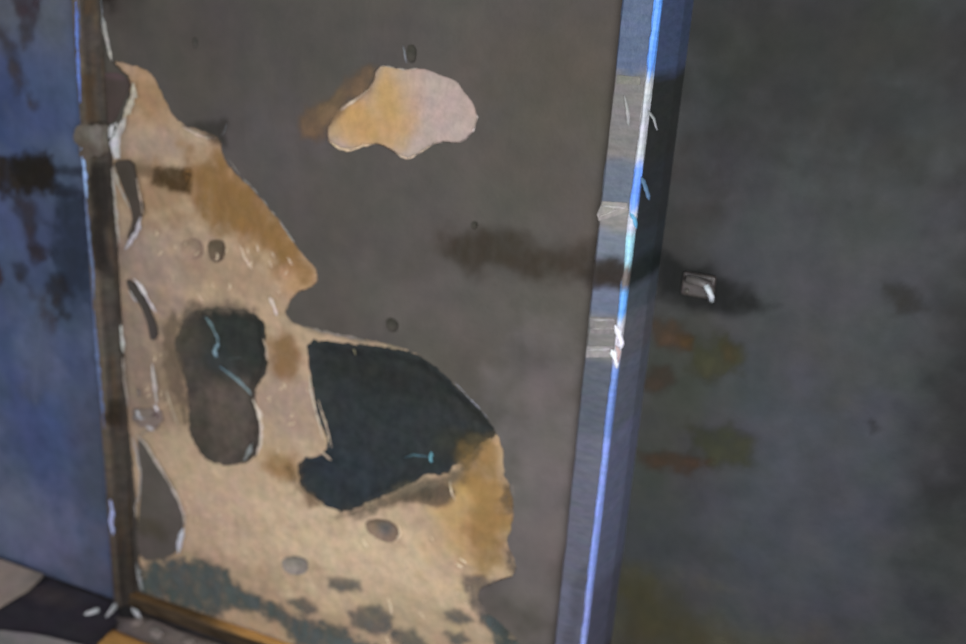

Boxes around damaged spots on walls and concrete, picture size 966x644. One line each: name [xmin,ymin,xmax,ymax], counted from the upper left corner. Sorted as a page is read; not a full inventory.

corrosion [0,155,109,270]
spalling [100,0,516,644]
damp [658,254,757,312]
damp [140,558,423,644]
damp [446,611,470,623]
damp [482,615,518,644]